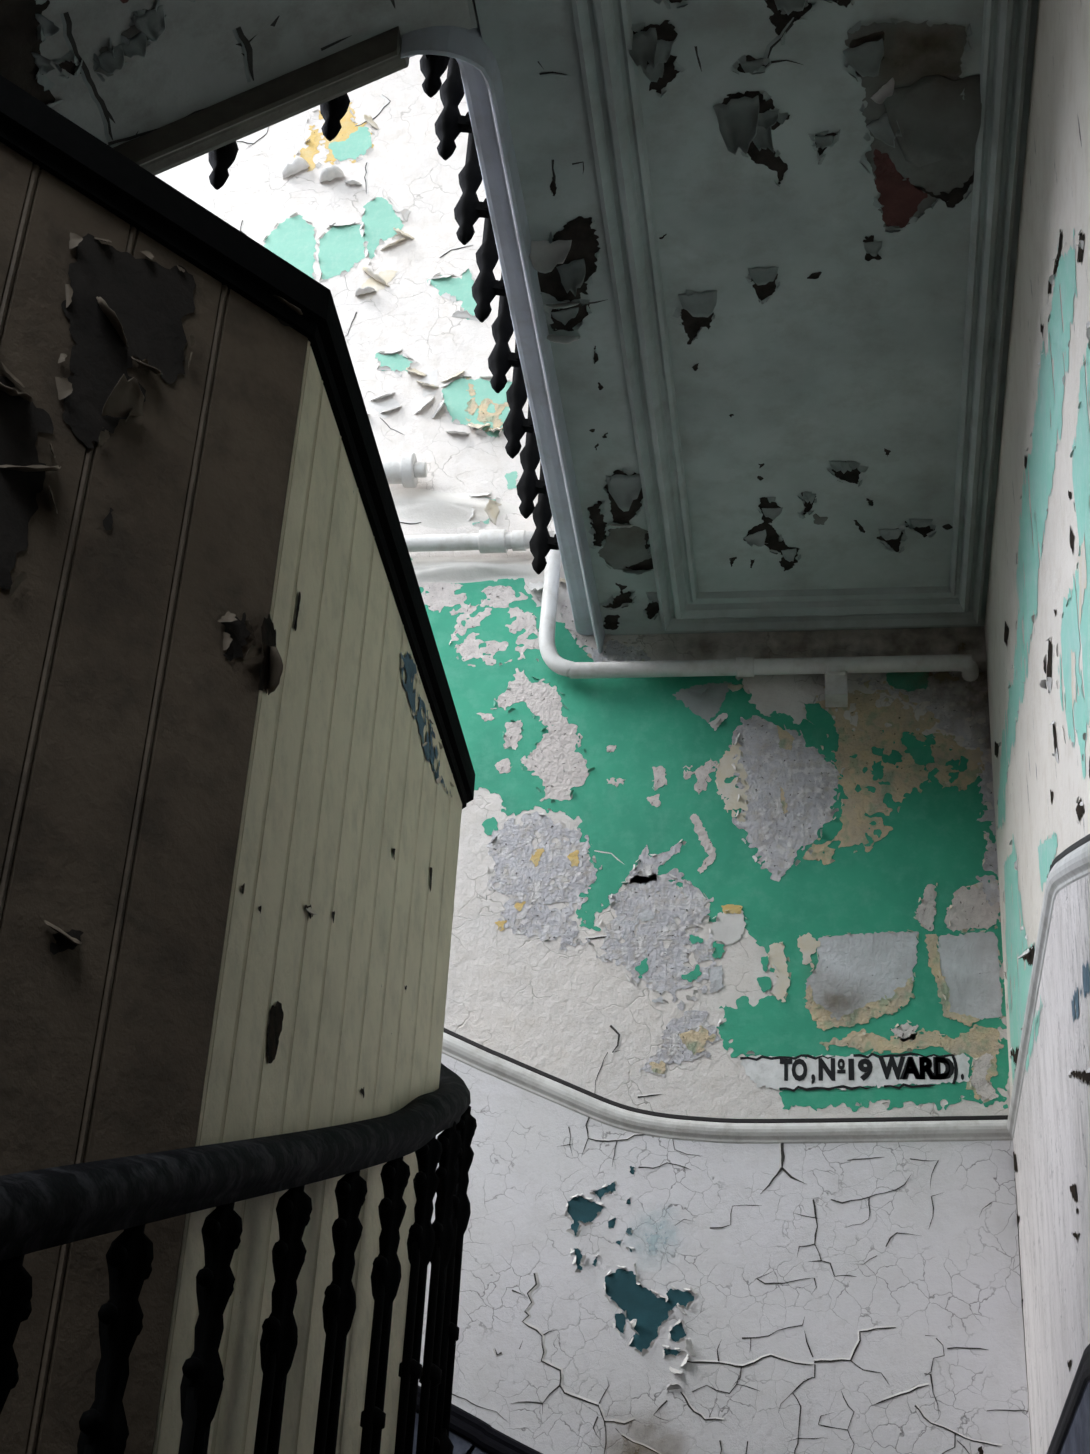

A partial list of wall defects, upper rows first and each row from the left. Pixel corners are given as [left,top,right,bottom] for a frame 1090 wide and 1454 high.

peeling [0,0,166,108]
peeling [263,102,414,299]
peeling [629,0,688,98]
peeling [713,55,790,188]
peeling [764,0,982,261]
peeling [368,349,512,442]
peeling [418,216,1090,1112]
peeling [564,1166,698,1390]
crack [452,1142,1032,1454]